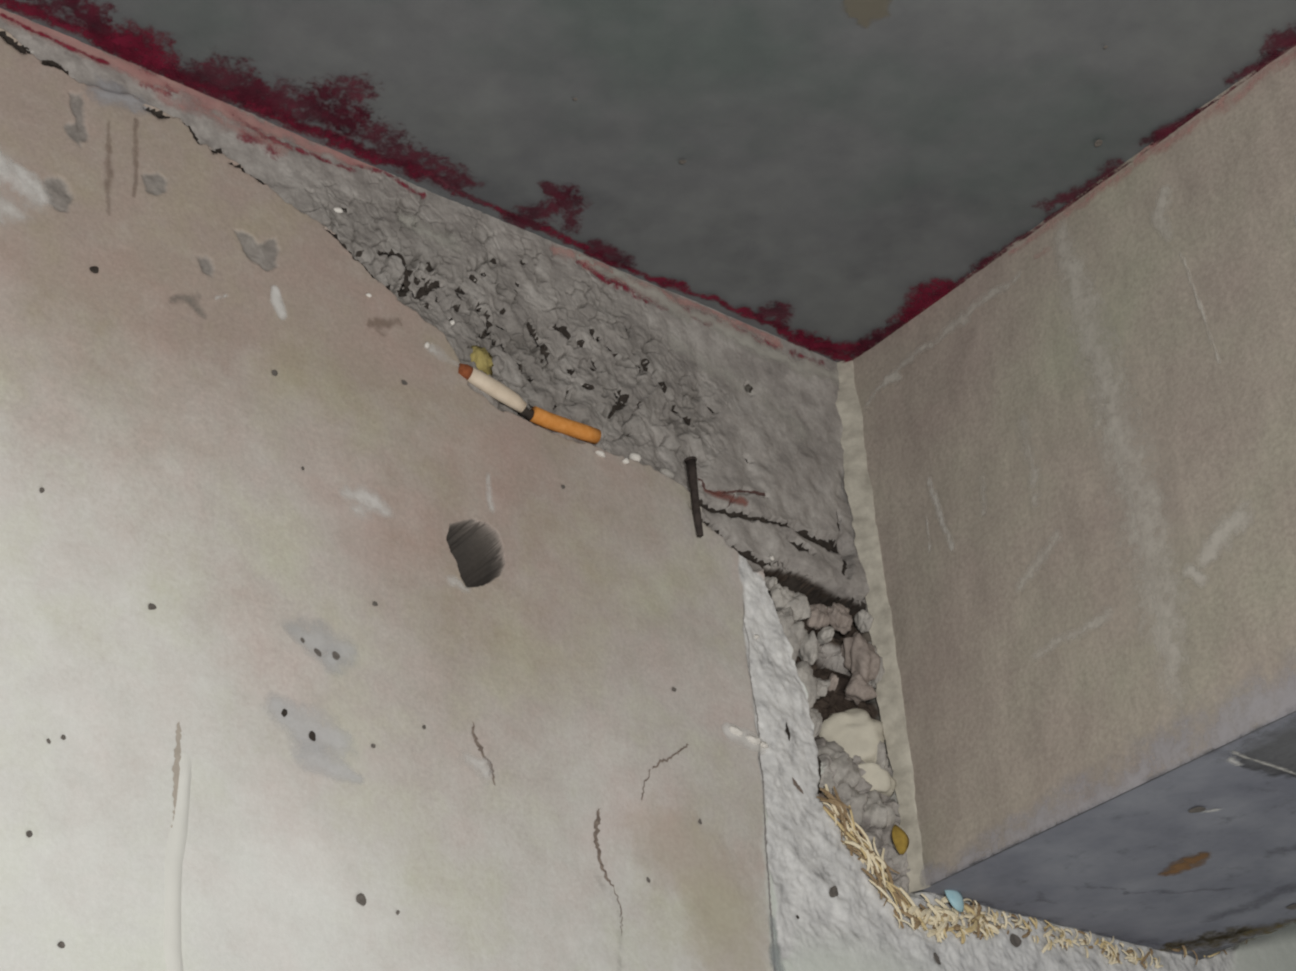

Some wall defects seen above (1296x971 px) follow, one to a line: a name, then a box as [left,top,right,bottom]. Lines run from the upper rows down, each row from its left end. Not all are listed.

damp [0,13,109,65]
damp [0,154,47,217]
damp [232,114,426,198]
damp [271,286,286,319]
damp [576,253,840,382]
flaking render [0,17,945,909]
crack [472,721,496,786]
crack [641,743,689,800]
crack [698,478,866,971]
peeling [734,555,1262,971]
crack [593,808,623,934]
rust [1158,852,1209,876]